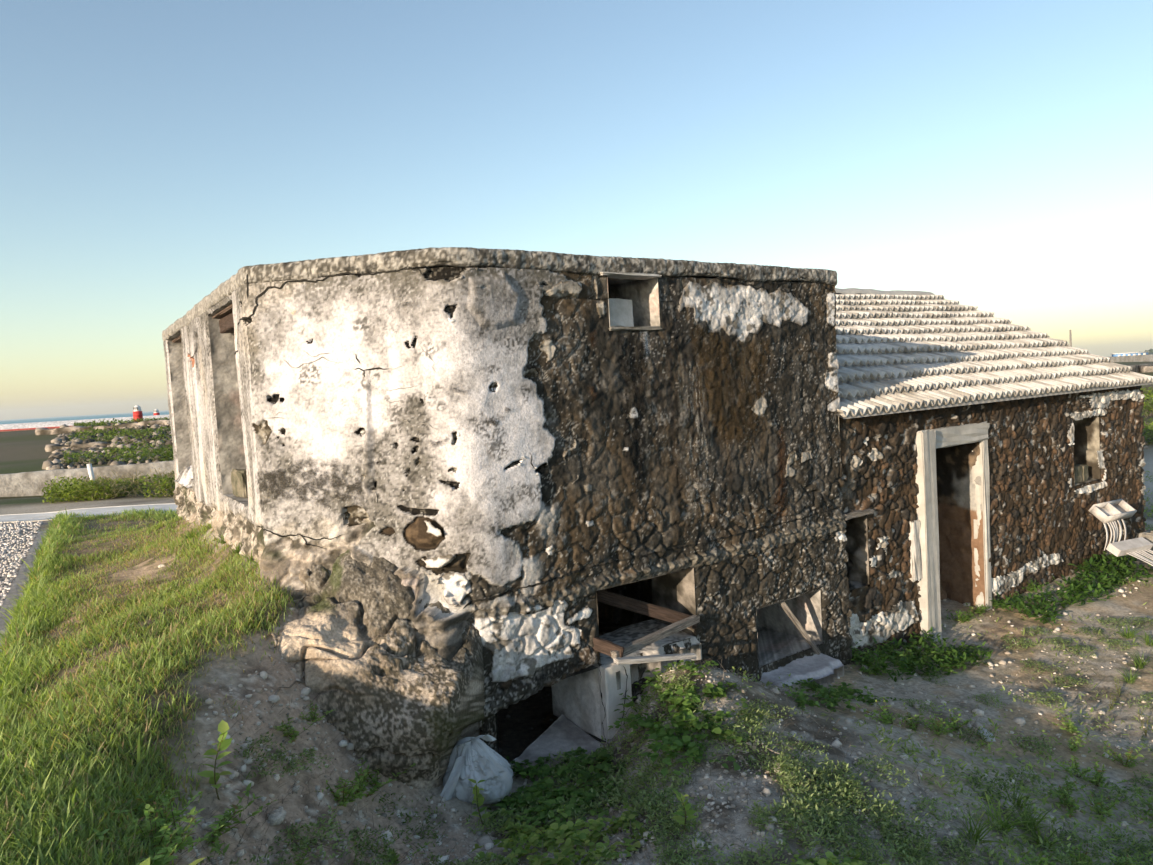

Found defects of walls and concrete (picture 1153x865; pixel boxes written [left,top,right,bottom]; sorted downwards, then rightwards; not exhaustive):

crack [234,267,423,355]
flaking render [536,278,605,318]
flaking render [678,281,809,342]
flaking render [523,339,556,378]
leakage [676,326,768,508]
flaking render [751,394,774,427]
flaking render [824,352,840,414]
spalling [504,456,548,476]
crack [257,526,341,549]
spalling [339,437,472,607]
crack [463,506,842,609]
flaking render [461,600,592,683]